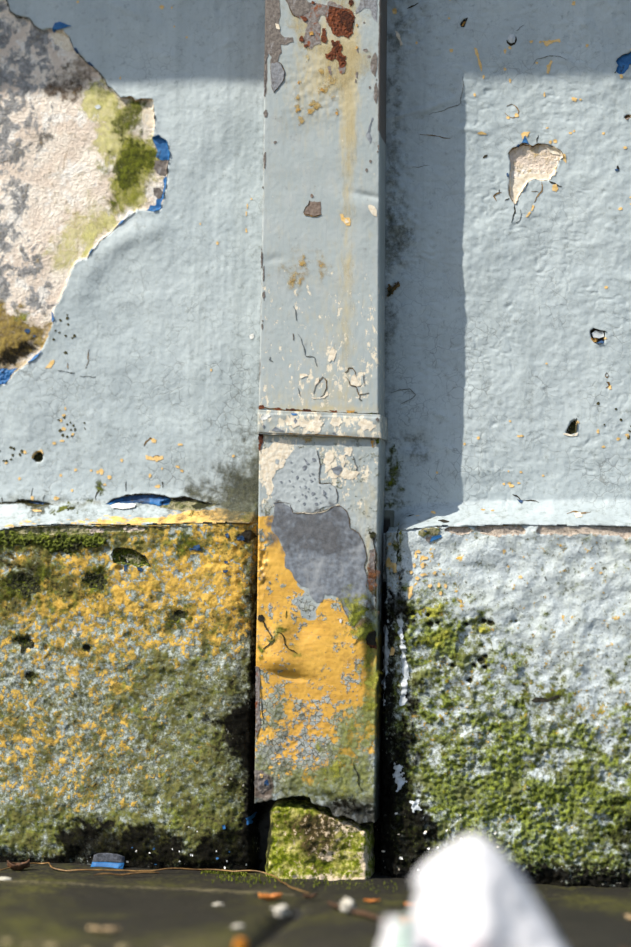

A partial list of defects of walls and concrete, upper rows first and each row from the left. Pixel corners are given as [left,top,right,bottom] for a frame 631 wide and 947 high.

rust [294,0,360,124]
peeling [615,49,631,78]
peeling [0,0,170,385]
peeling [493,127,566,223]
spalling [0,446,43,464]
spalling [52,407,85,445]
spalling [14,525,179,535]
peeling [225,413,379,627]
damp [0,617,269,873]
damp [374,569,439,879]
damp [524,868,584,887]
damp [612,815,631,869]